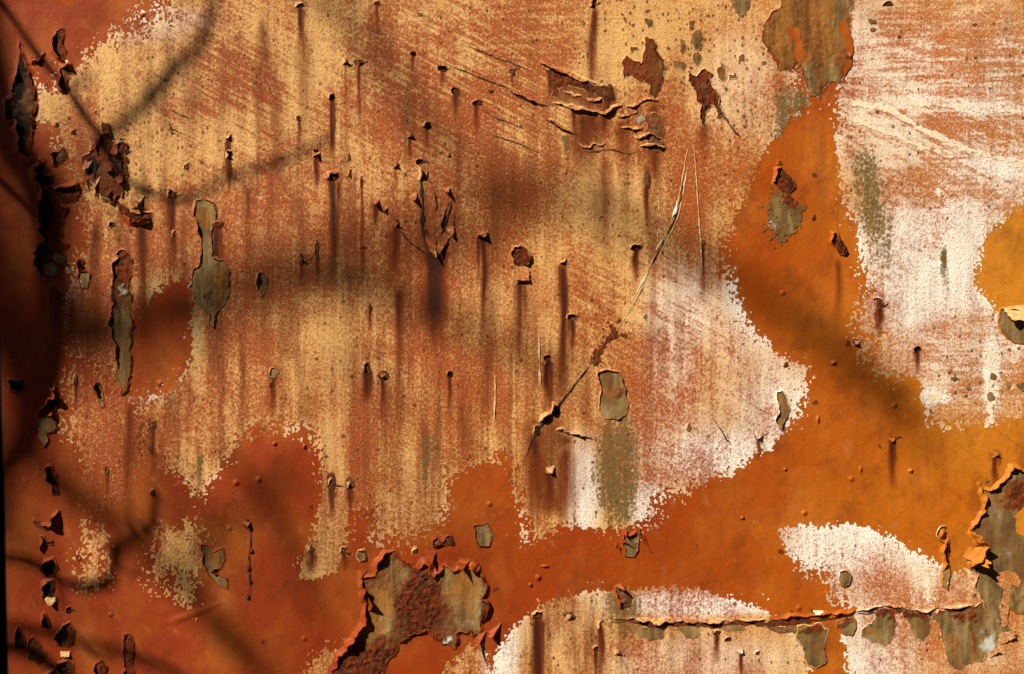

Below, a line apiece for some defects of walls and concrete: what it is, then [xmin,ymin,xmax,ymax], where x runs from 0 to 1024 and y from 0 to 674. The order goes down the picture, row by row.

corrosion [588,0,601,83]
corrosion [297,92,399,276]
corrosion [362,289,402,403]
peeling [0,0,816,674]
corrosion [543,258,581,404]
crack [523,318,631,464]
corrosion [628,244,643,275]
peeling [760,0,1024,432]
corrosion [327,472,354,513]
peeling [778,463,1024,674]
corrosion [531,610,544,674]
corrosion [712,629,760,674]